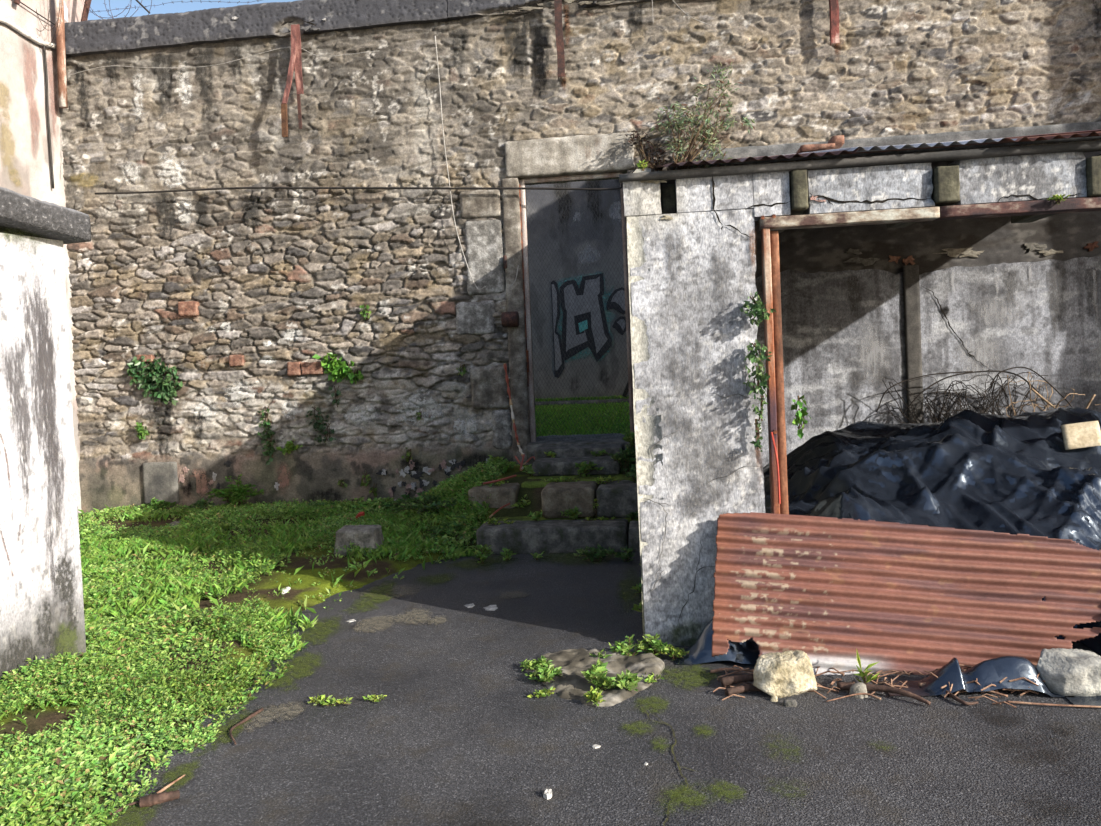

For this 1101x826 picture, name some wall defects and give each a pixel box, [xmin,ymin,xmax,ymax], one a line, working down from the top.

water stain [75,65,89,125]
water stain [105,57,118,85]
efflorescence [133,74,143,119]
water stain [153,48,212,113]
water stain [231,46,242,82]
efflorescence [124,163,140,183]
water stain [156,156,209,240]
water stain [242,195,261,228]
crack [712,176,935,238]
water stain [0,288,78,688]
crack [647,499,668,591]
crack [678,540,715,628]